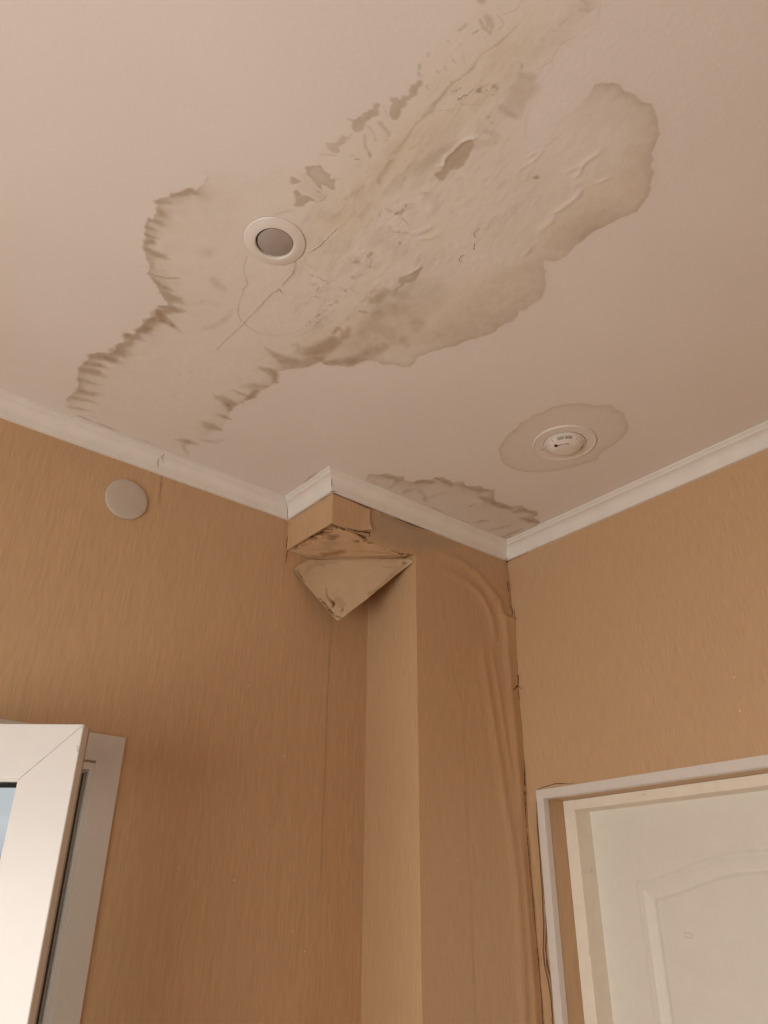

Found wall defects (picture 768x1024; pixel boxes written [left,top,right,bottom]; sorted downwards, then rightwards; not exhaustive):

crack [224,228,337,342]
leakage [62,0,664,457]
leakage [498,402,629,473]
leakage [363,472,542,540]